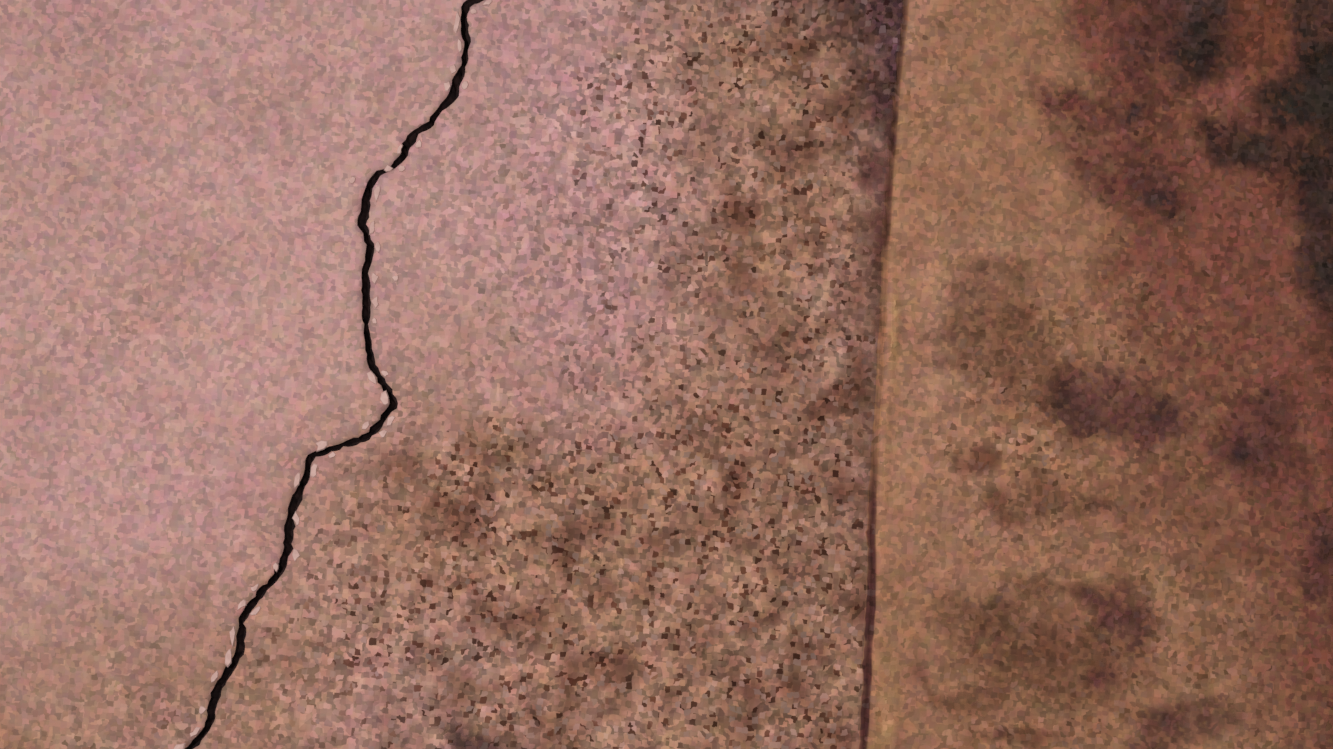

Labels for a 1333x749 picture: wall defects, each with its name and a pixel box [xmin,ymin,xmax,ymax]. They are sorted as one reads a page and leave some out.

leakage [1143,0,1239,81]
leakage [824,0,902,263]
leakage [1040,93,1180,217]
leakage [1200,0,1333,327]
crack [174,0,492,749]
leakage [950,310,1186,449]
leakage [1219,390,1297,473]
leakage [959,601,1113,697]